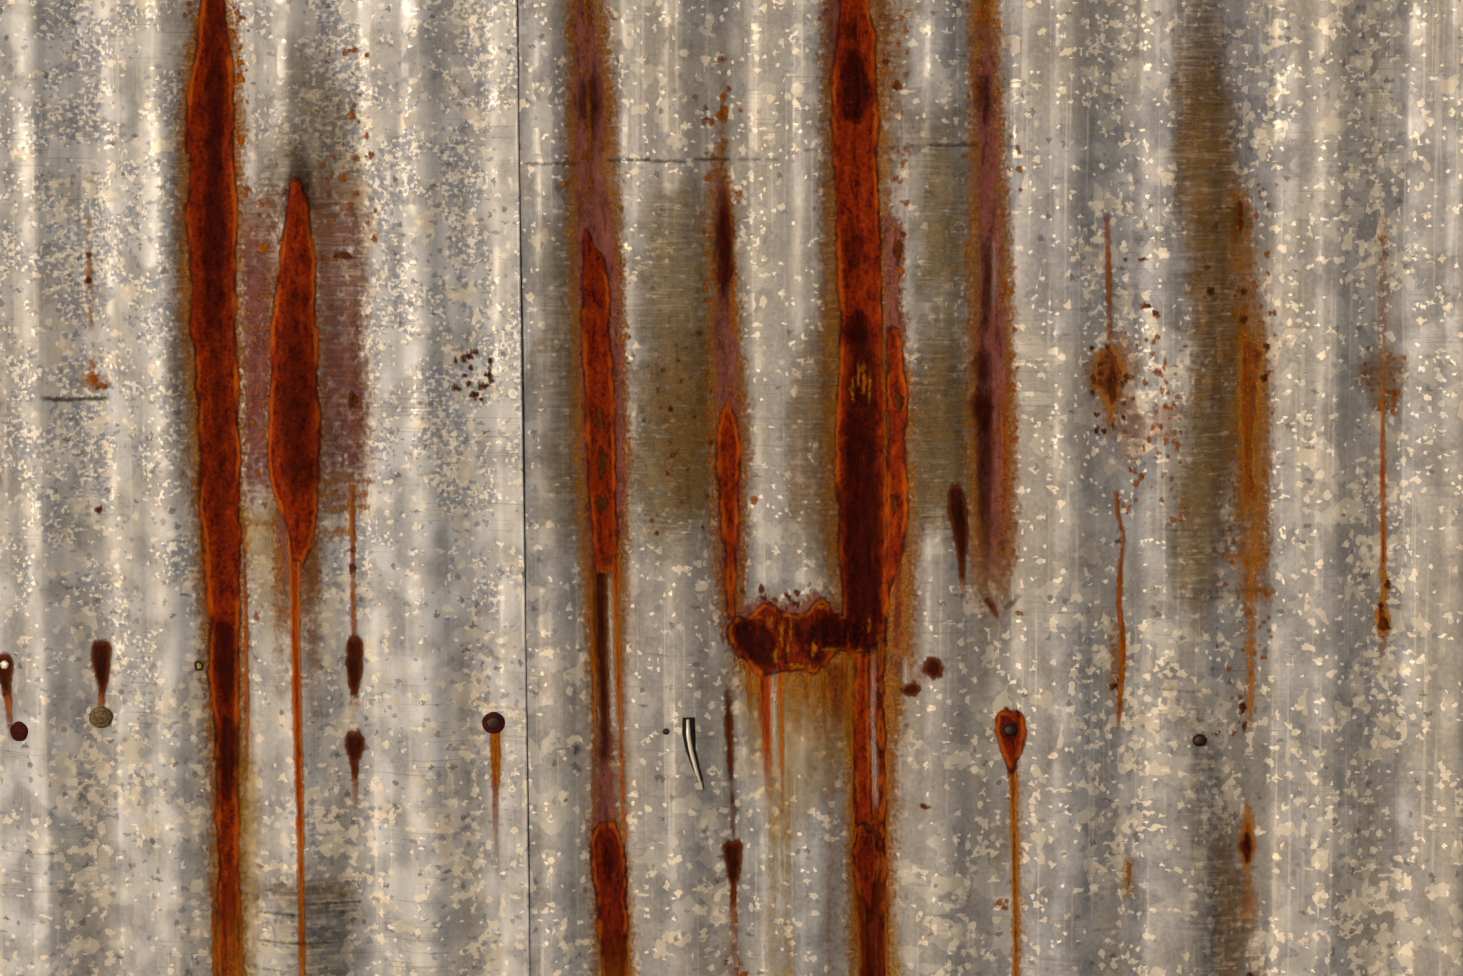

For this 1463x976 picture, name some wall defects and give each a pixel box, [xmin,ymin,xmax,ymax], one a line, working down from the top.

corrosion [0,653,13,727]
corrosion [91,640,111,706]
corrosion [177,0,377,976]
corrosion [490,732,500,809]
corrosion [540,0,634,976]
corrosion [701,0,943,976]
corrosion [947,0,1022,617]
corrosion [994,707,1027,976]